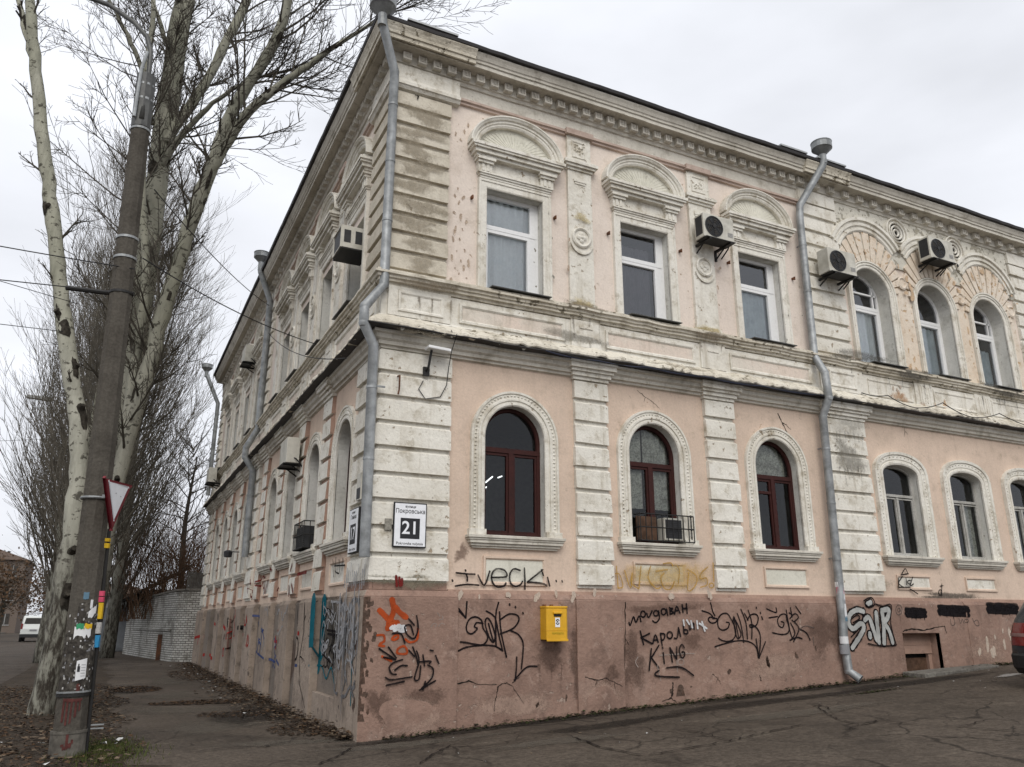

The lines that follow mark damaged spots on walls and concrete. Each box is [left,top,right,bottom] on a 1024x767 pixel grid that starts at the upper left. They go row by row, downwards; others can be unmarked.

peeling [449,187,470,280]
spalling [352,597,377,722]
crack [457,680,523,712]